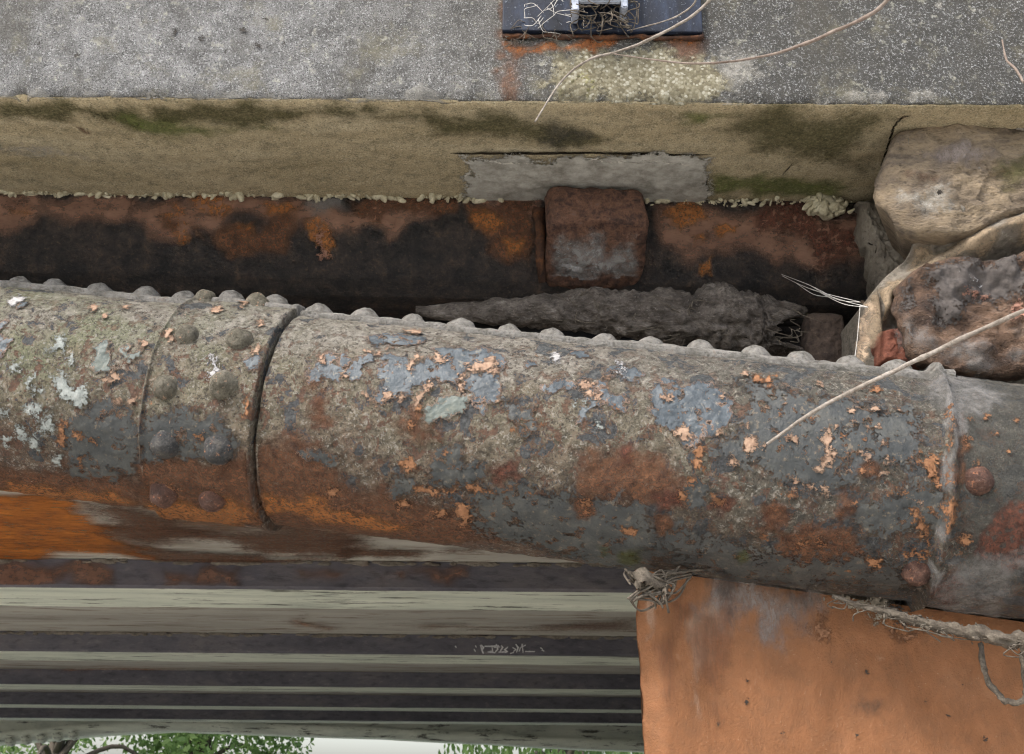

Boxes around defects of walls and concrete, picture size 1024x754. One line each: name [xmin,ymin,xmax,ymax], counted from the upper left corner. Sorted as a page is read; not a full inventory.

corrosion [496,32,704,101]
damp [415,110,602,147]
crack [881,116,908,165]
corrosion [0,194,541,265]
corrosion [657,201,860,275]
peeling [5,293,28,309]
peeling [241,343,264,374]
peeling [55,328,254,485]
corrosion [0,433,500,586]
corrosion [576,443,685,509]
peeling [303,328,1024,644]
corrosion [759,493,867,582]